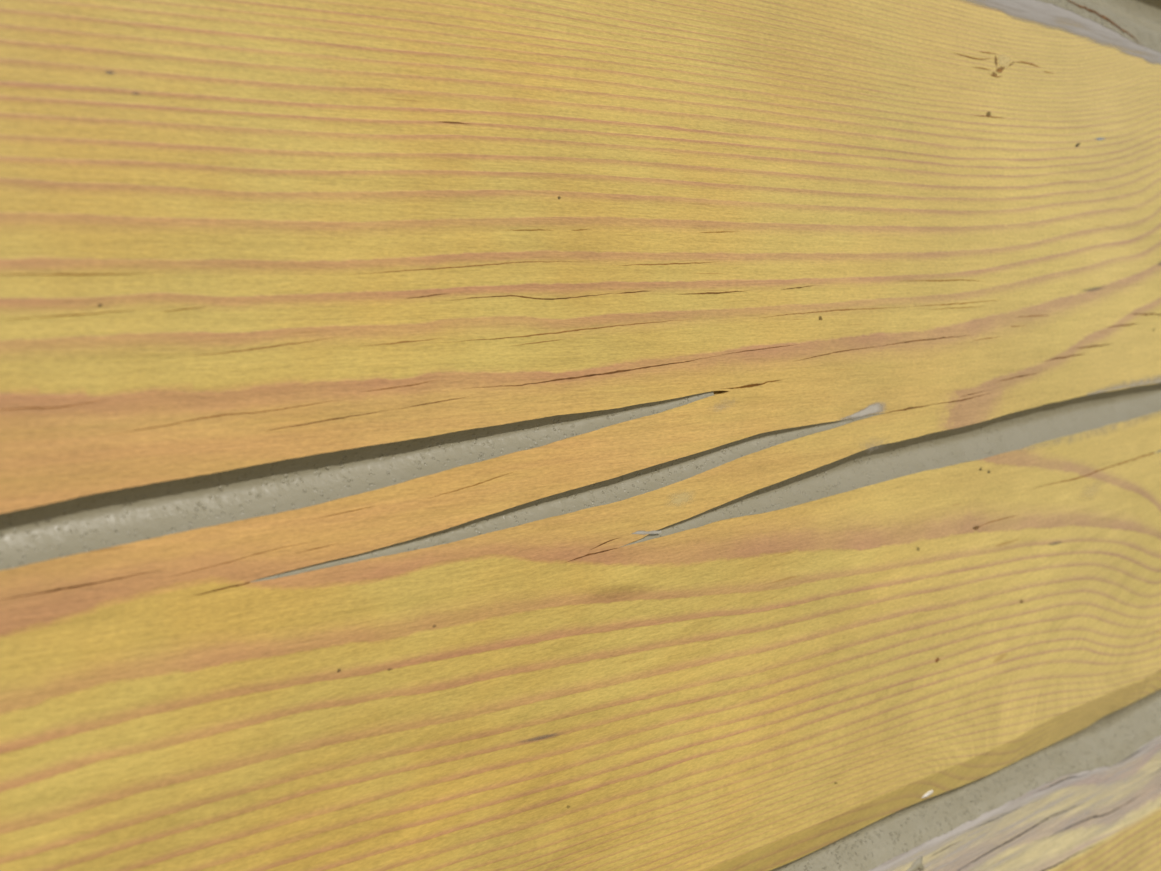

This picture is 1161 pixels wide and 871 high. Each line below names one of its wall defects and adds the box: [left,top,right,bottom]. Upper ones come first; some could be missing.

crack [365,261,706,300]
crack [491,280,1049,387]
crack [0,313,1161,600]